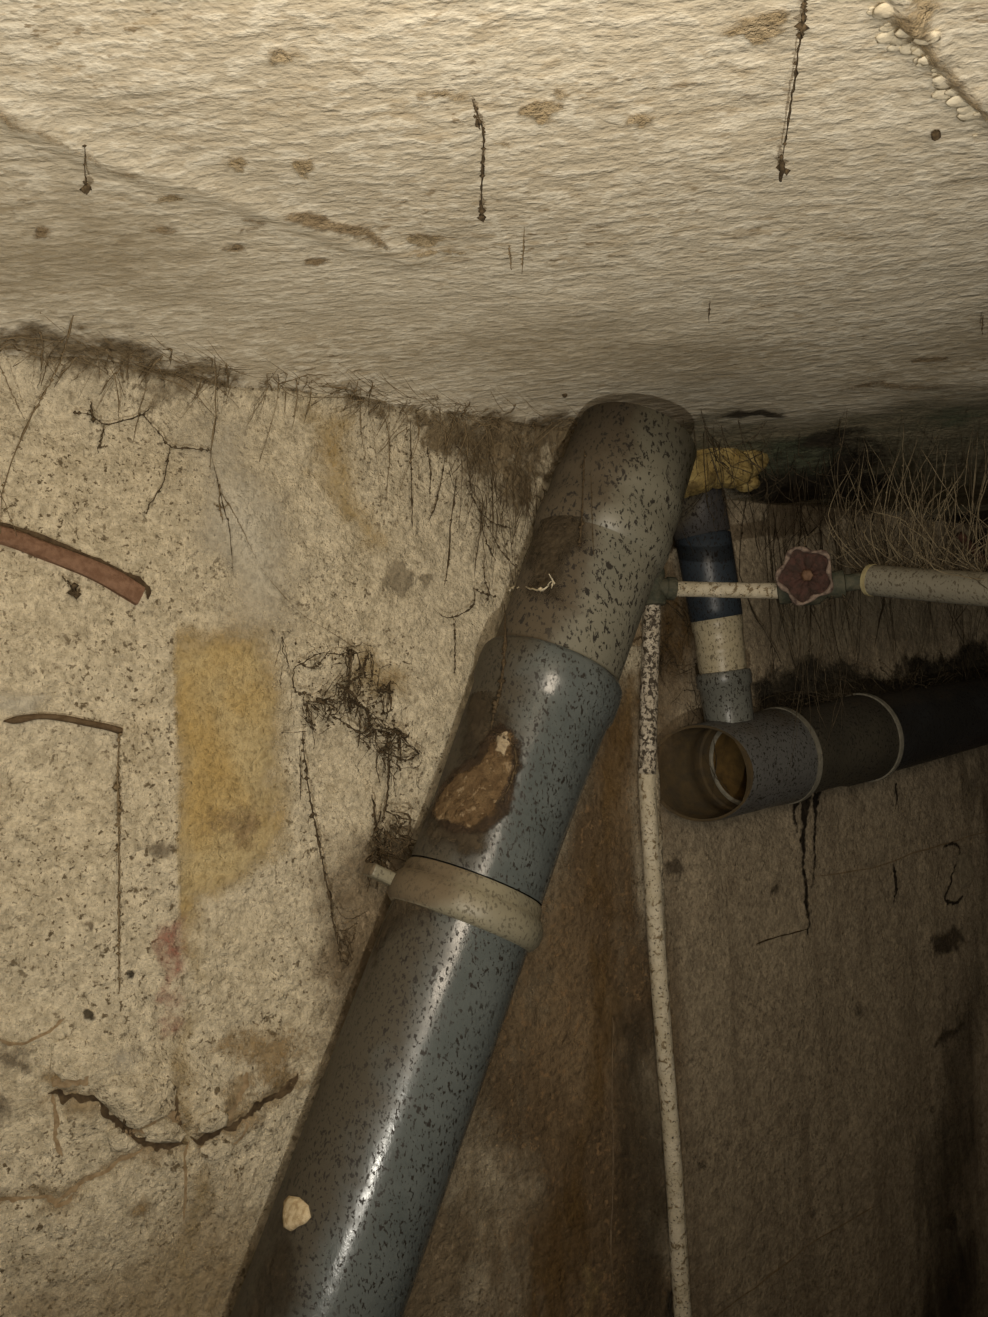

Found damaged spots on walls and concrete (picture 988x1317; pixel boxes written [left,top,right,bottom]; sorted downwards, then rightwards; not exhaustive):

water stain [0,325,239,407]
water stain [345,390,579,516]
rust [0,526,145,605]
water stain [149,632,284,971]
water stain [793,791,821,934]
crack [0,1072,298,1222]